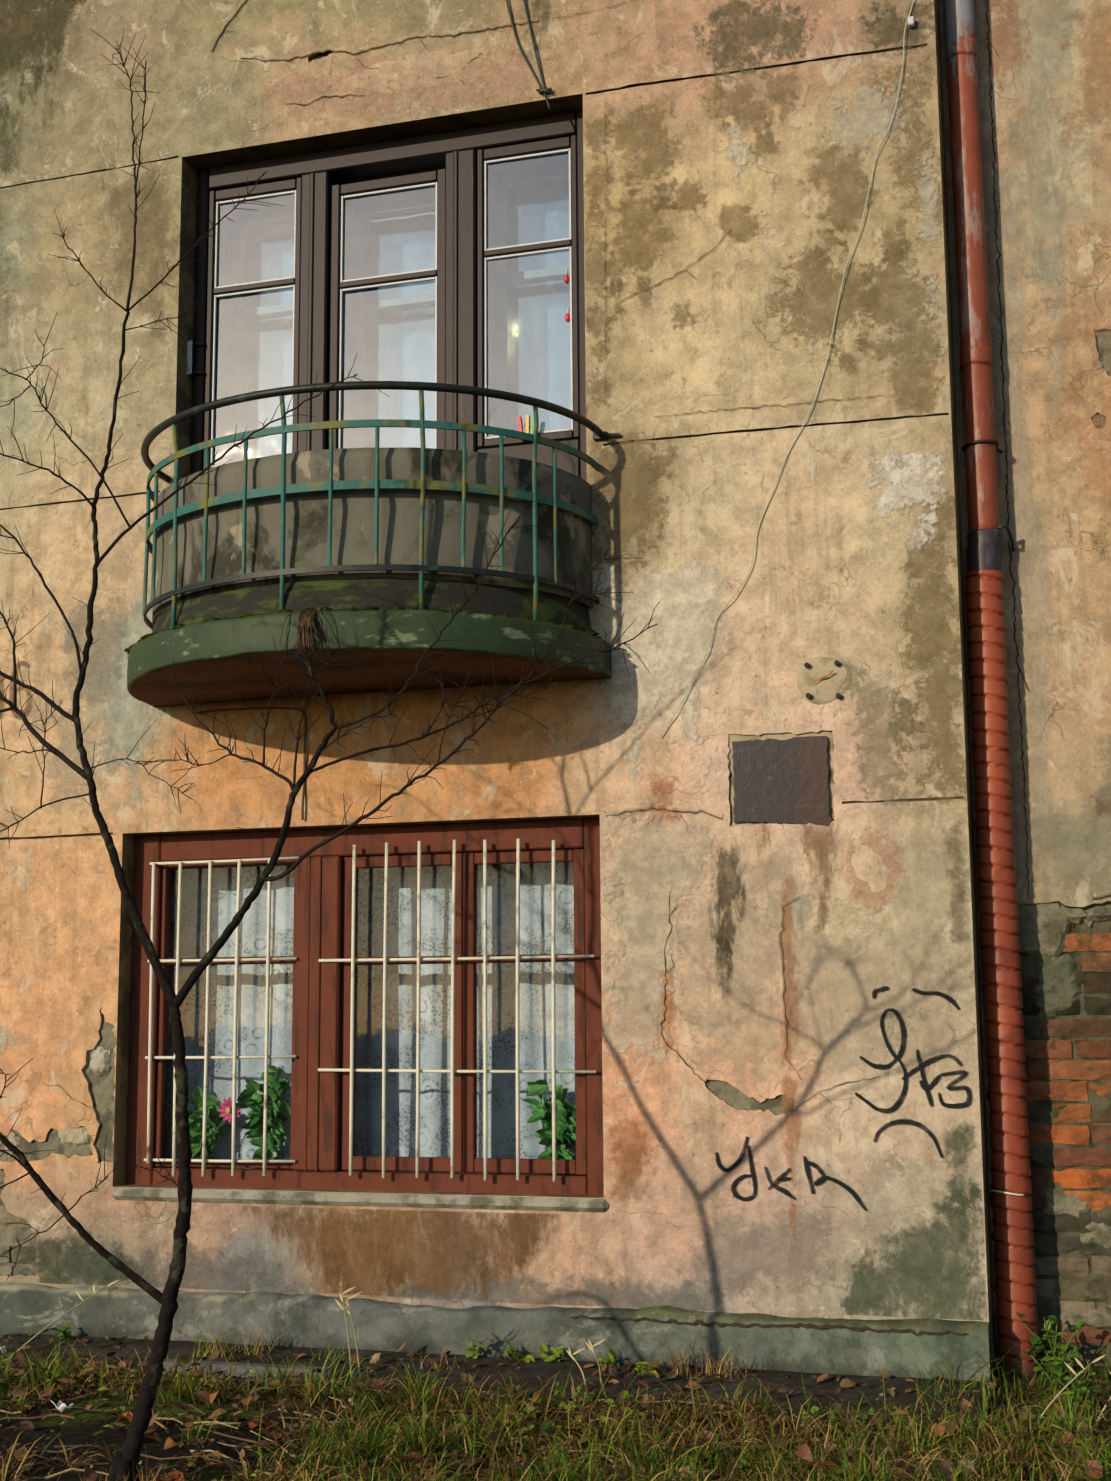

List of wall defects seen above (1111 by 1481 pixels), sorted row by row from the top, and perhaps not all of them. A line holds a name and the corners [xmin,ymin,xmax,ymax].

water stain [0,0,115,89]
crack [208,0,631,105]
spalling [1094,328,1111,376]
crack [986,0,1030,899]
peeling [842,447,967,802]
crack [660,887,709,1082]
water stain [712,848,745,998]
spalling [0,1006,120,1276]
water stain [944,1126,978,1213]
flaking render [1015,901,1111,1367]
water stain [273,1208,715,1311]